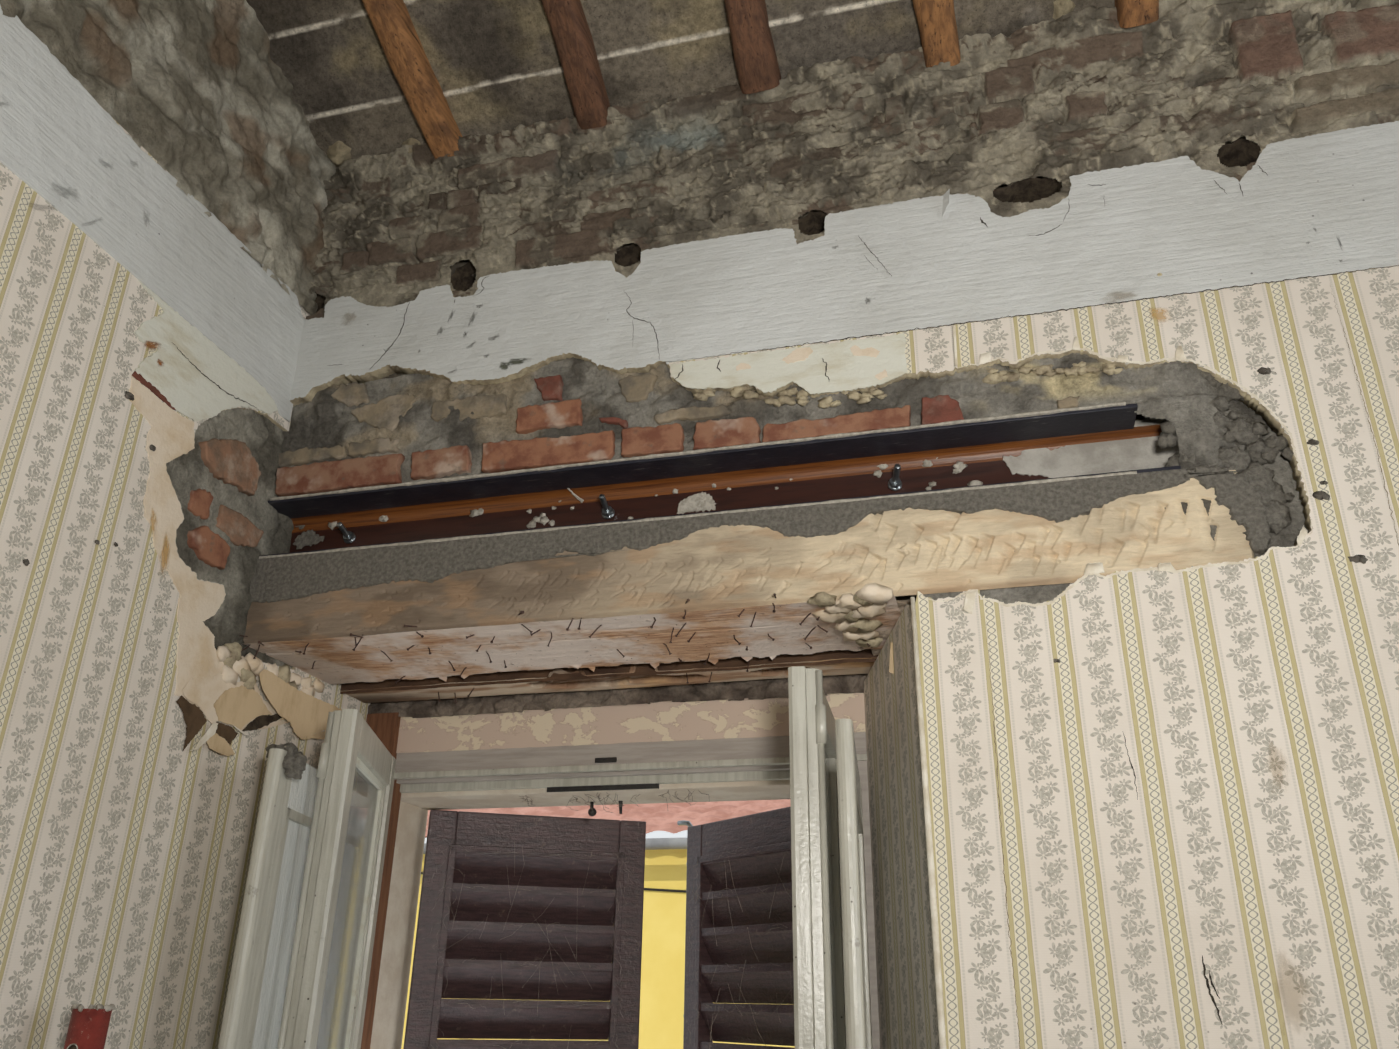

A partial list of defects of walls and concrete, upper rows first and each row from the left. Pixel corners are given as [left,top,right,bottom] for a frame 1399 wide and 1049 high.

flaking render [0,0,1399,320]
flaking render [124,280,1330,716]
crack [626,265,1399,545]
crack [1123,733,1138,800]
crack [1202,955,1223,1025]